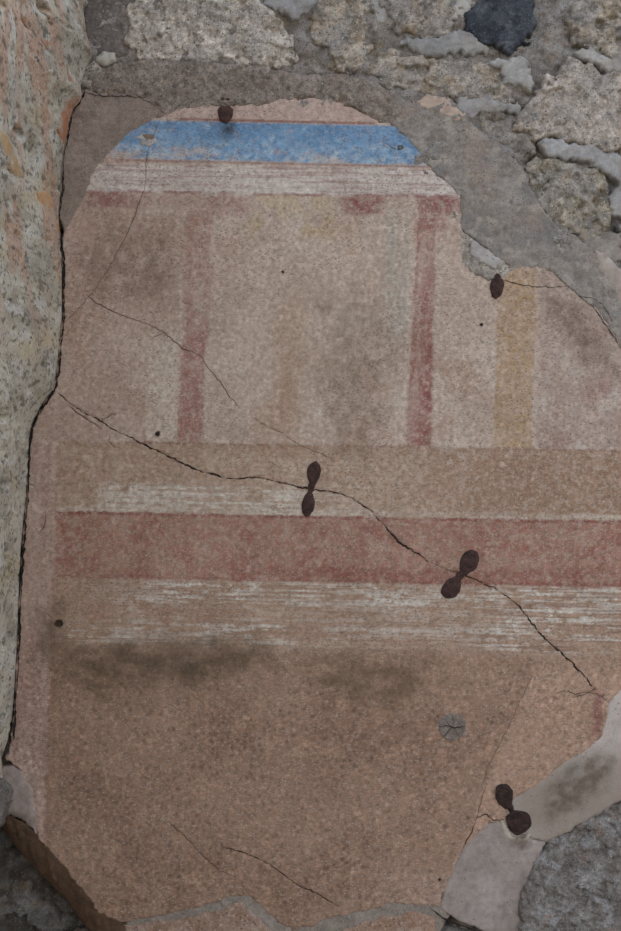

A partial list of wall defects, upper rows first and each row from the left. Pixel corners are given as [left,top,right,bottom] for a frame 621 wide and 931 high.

crack [13,90,619,741]
crack [462,678,531,849]
spalling [500,819,530,844]